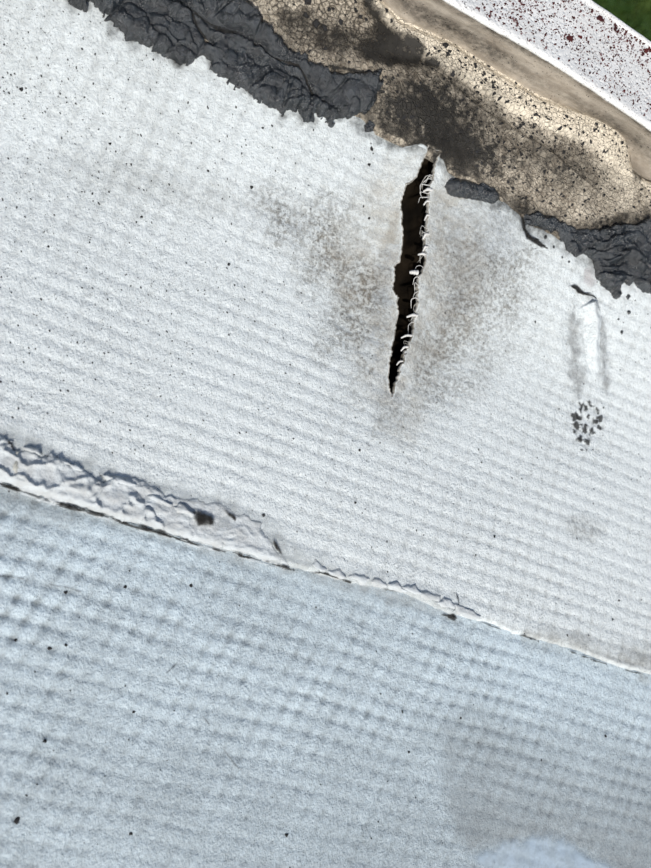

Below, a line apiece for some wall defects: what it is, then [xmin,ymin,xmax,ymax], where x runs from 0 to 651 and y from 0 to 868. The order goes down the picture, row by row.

crack [185,0,384,96]
damp [479,839,605,868]